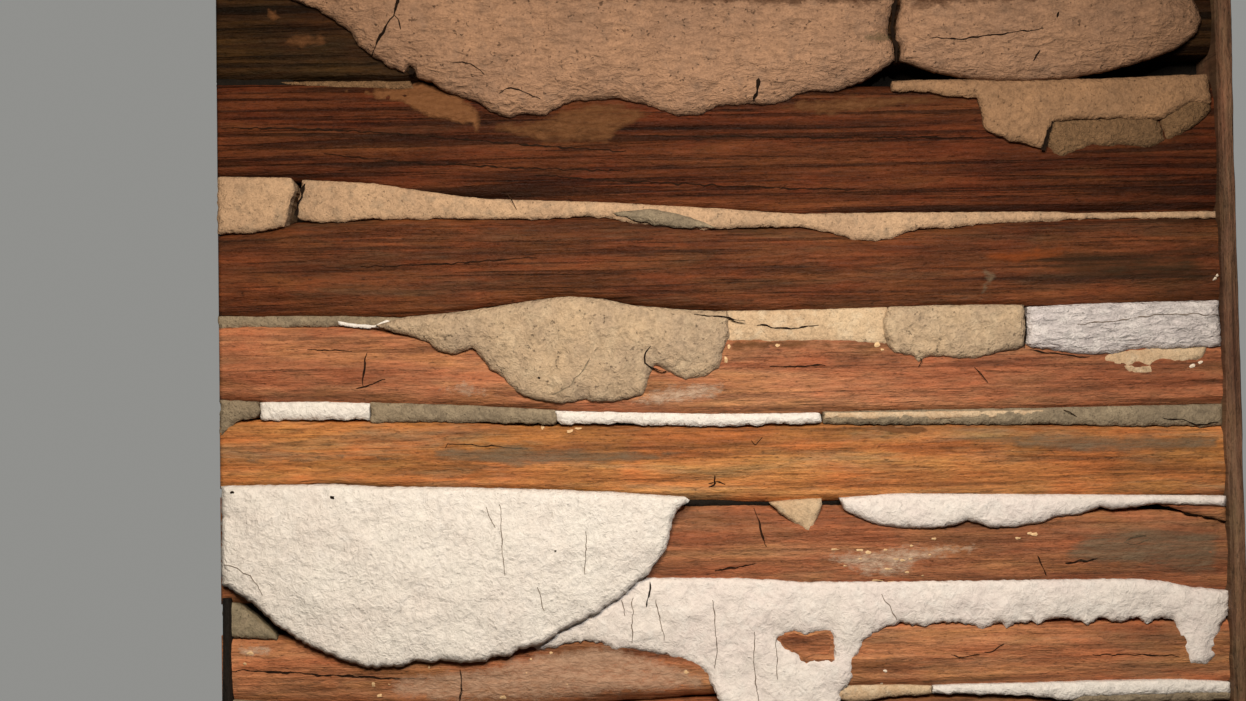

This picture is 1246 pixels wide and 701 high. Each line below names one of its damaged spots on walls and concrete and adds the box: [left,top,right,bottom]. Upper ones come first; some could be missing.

crack [372,0,401,54]
crack [890,0,898,63]
crack [933,12,1059,61]
peeling [292,0,1211,156]
peeling [376,296,731,403]
peeling [874,300,1221,373]
crack [621,583,665,640]
peeling [221,484,1228,701]
crack [712,509,767,668]
crack [753,632,778,701]